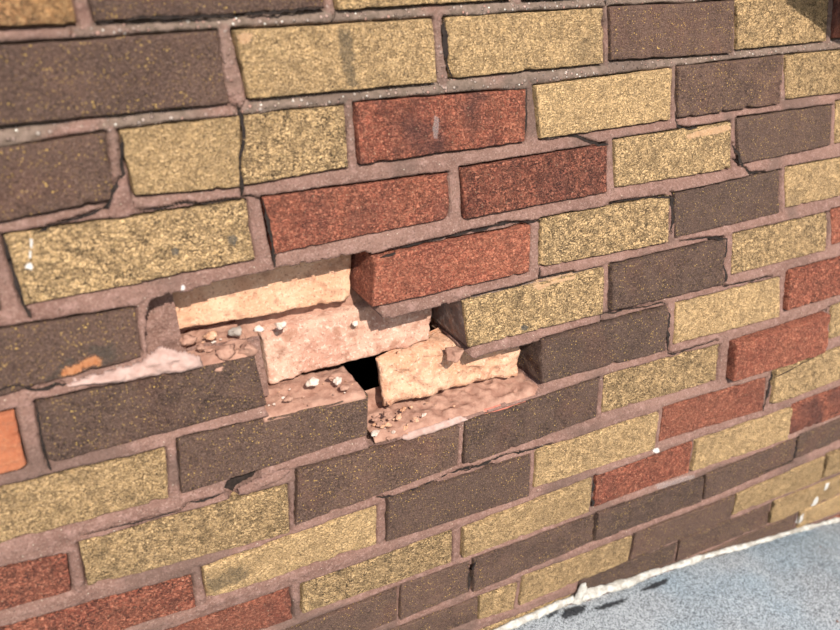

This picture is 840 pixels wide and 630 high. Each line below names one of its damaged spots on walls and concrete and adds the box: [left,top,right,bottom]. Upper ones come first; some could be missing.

crack [37,135,125,233]
crack [141,98,276,268]
spalling [172,254,521,406]
crack [0,383,66,471]
spalling [402,416,468,440]